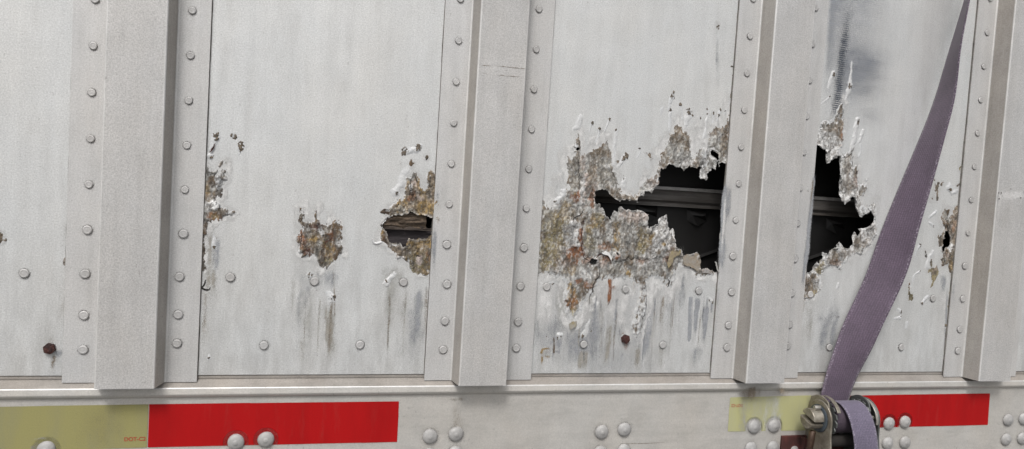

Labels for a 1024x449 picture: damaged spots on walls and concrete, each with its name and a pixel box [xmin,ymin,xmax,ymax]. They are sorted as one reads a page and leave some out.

rust [291,198,350,276]
rust [537,88,731,351]
leakage [718,182,732,270]
leakage [288,266,339,368]
leakage [533,267,720,378]